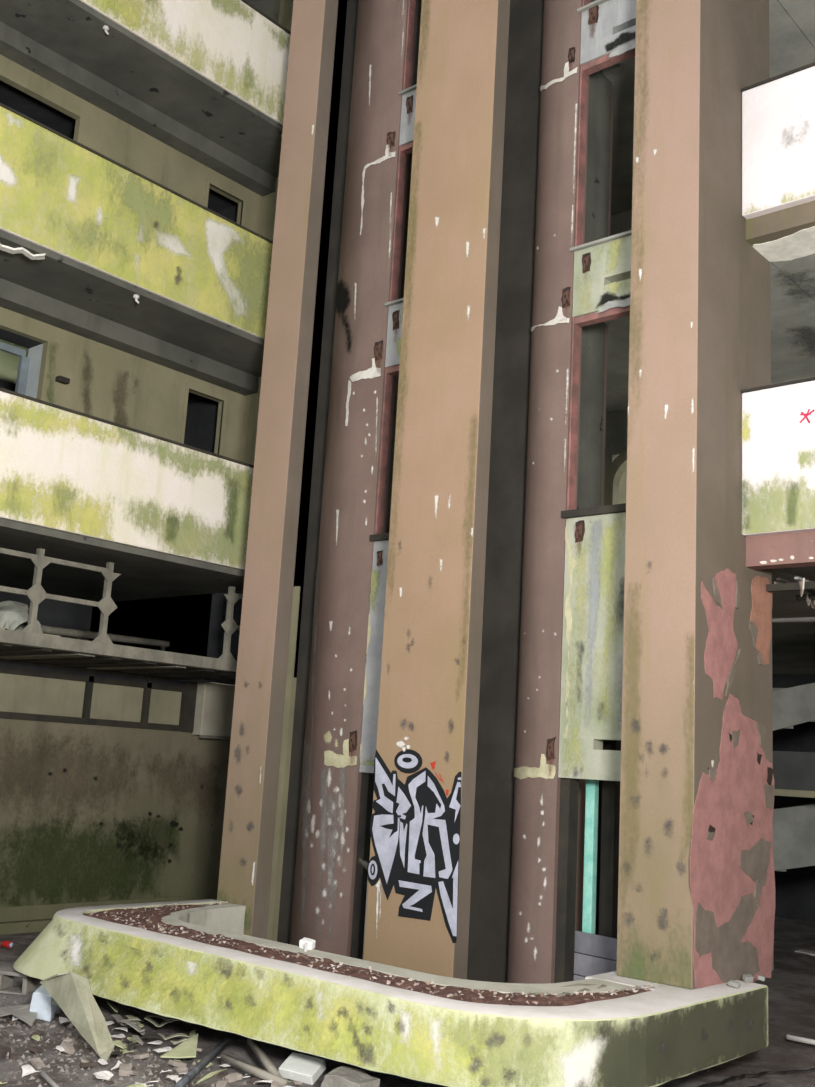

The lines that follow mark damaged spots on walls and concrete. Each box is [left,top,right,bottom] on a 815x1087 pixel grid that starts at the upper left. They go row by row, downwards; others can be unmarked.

leakage [0,156,17,185]
leakage [67,175,79,202]
leakage [157,231,190,256]
leakage [206,219,248,316]
leakage [226,480,237,540]
leakage [167,518,177,540]
peeling [690,555,794,988]
leakage [69,935,82,966]
leakage [401,1011,409,1039]
leakage [561,1040,601,1087]
crack [697,1068,815,1087]